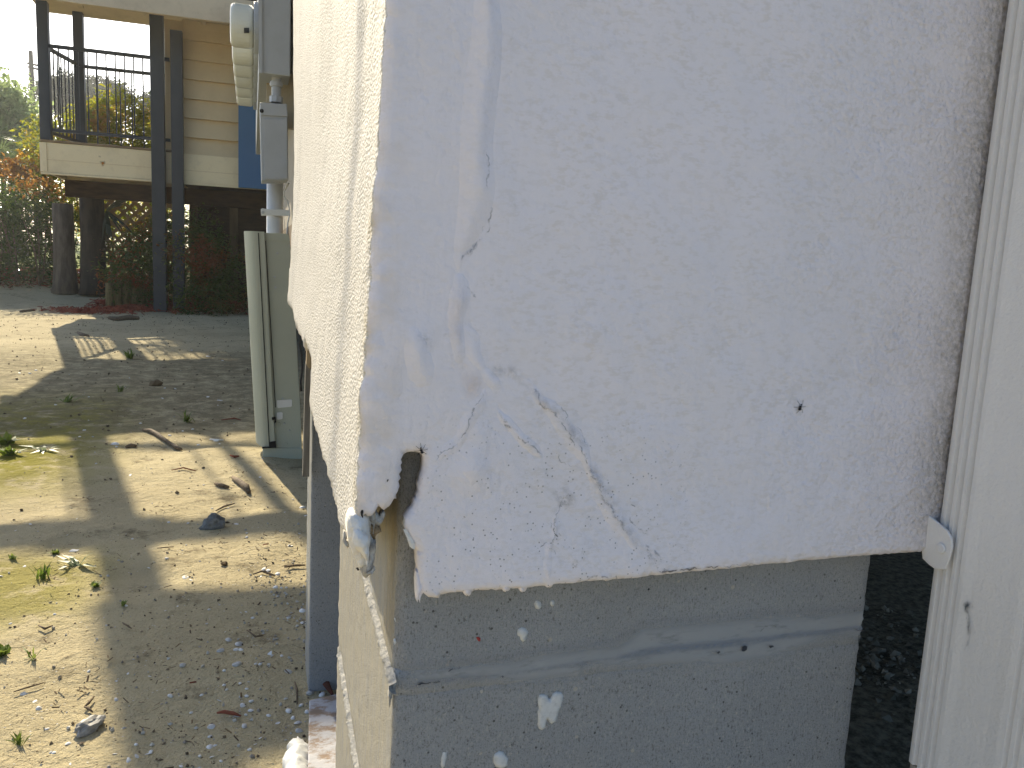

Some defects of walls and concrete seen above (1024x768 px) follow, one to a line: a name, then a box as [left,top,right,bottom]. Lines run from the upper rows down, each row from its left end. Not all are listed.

spalling [342,507,385,578]